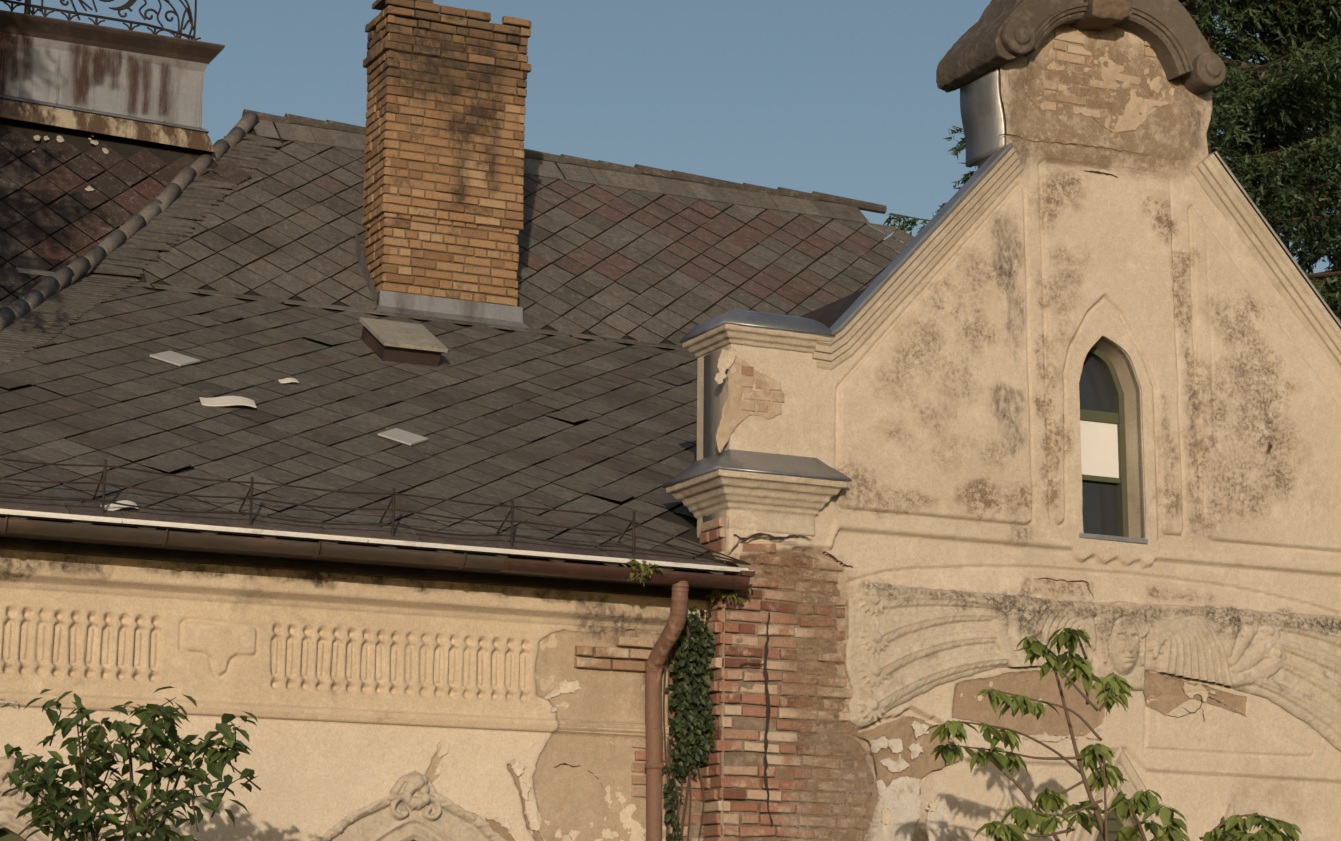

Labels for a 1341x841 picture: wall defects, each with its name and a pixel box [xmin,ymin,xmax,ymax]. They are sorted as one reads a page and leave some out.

corrosion [0,32,32,98]
corrosion [75,47,169,114]
flaking render [1024,25,1179,134]
peeling [714,348,785,452]
damp [959,431,1071,510]
damp [288,571,354,583]
peeling [485,629,661,841]
flaking render [661,517,960,841]
crack [1164,697,1247,721]